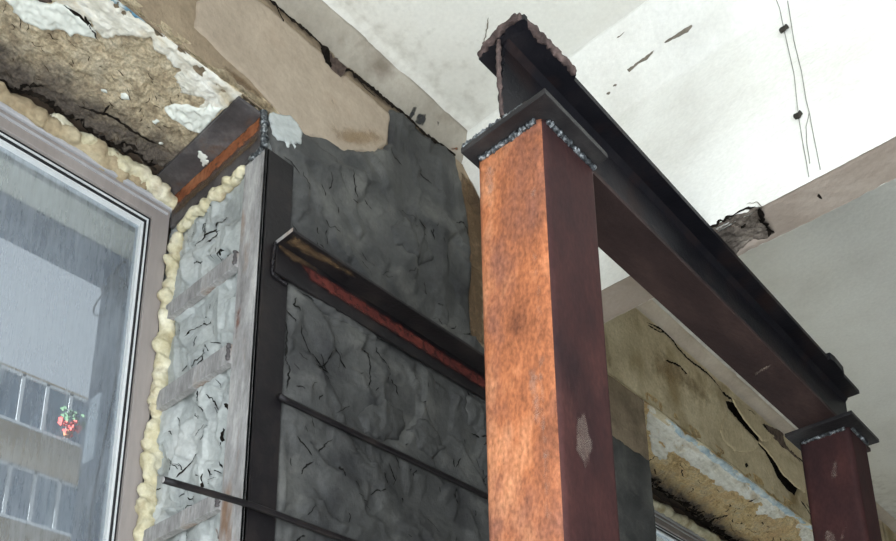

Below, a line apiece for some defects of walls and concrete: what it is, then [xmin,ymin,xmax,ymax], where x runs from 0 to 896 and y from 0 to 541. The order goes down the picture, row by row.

crack [0,5,179,166]
peeling [5,0,242,133]
spalling [321,45,347,77]
corrosion [174,117,260,212]
spalling [711,202,774,254]
crack [206,394,228,442]
crack [648,323,802,461]
crack [176,454,204,509]
peeling [643,398,814,541]